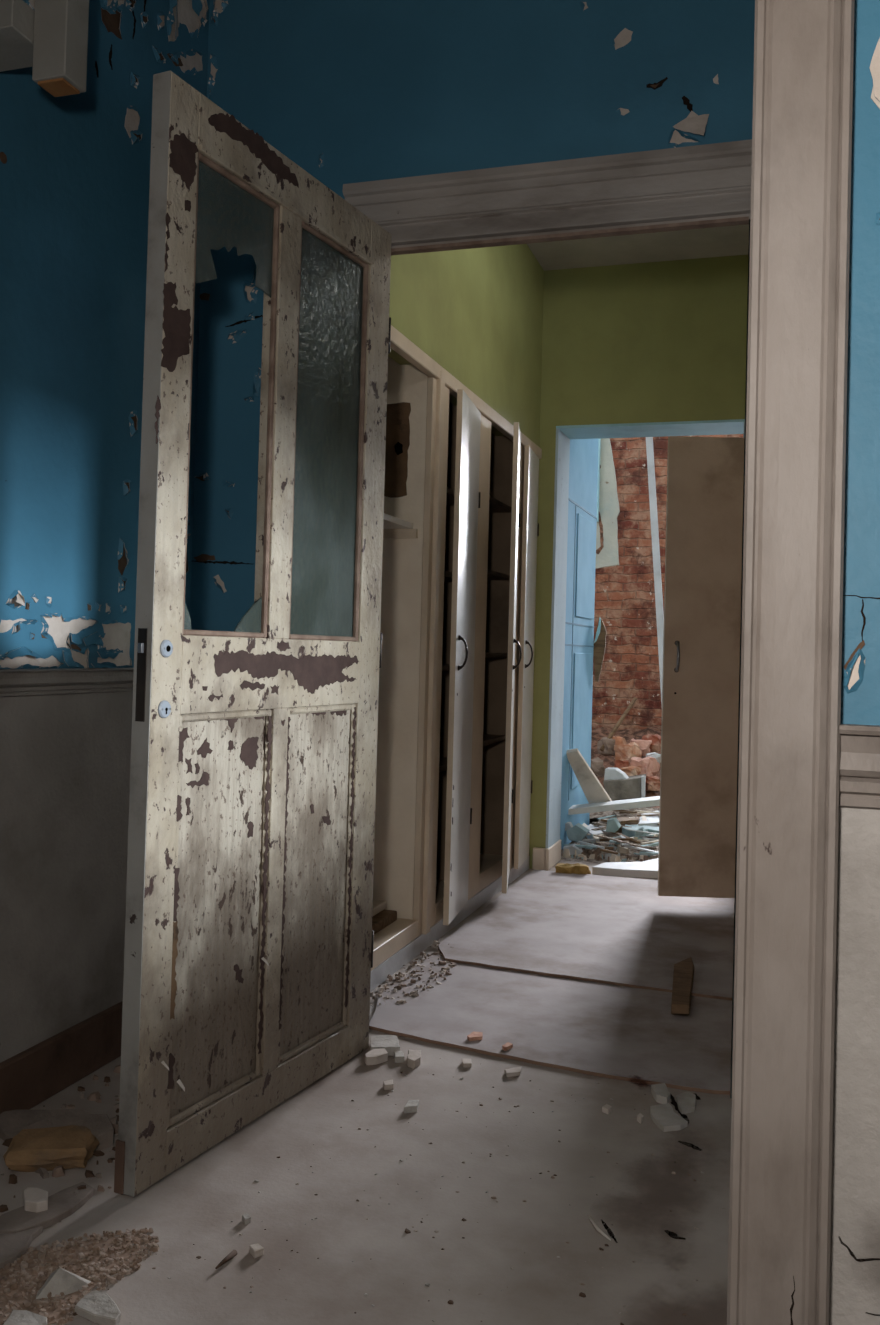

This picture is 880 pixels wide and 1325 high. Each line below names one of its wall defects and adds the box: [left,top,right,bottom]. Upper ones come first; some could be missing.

peeling [100,0,228,98]
peeling [612,28,633,50]
peeling [870,38,880,109]
peeling [668,96,709,148]
peeling [0,537,132,669]
crack [788,1276,796,1325]